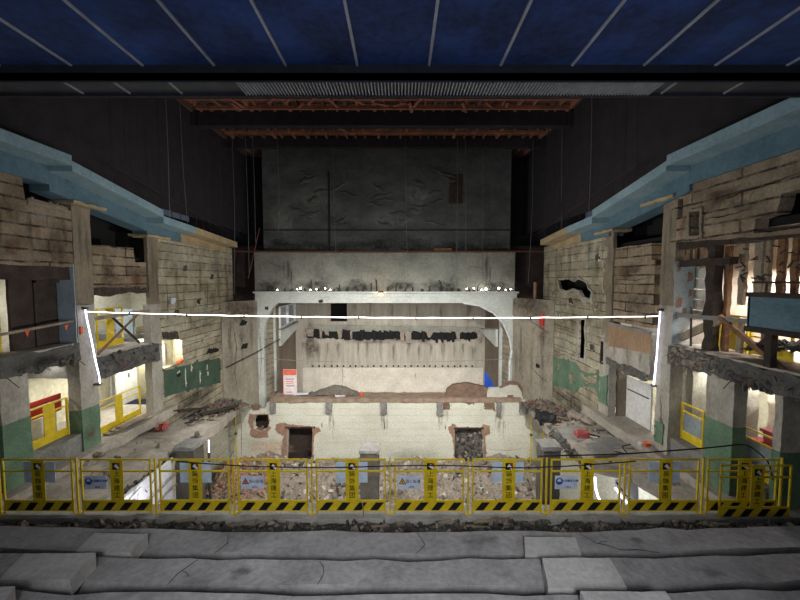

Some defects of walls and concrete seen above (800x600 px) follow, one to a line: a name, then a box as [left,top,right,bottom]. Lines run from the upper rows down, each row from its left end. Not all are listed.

spalling [557,276,598,311]
spalling [0,354,86,388]
peeling [99,331,221,398]
peeling [553,344,649,406]
spalling [666,345,800,403]
spalling [229,399,583,470]